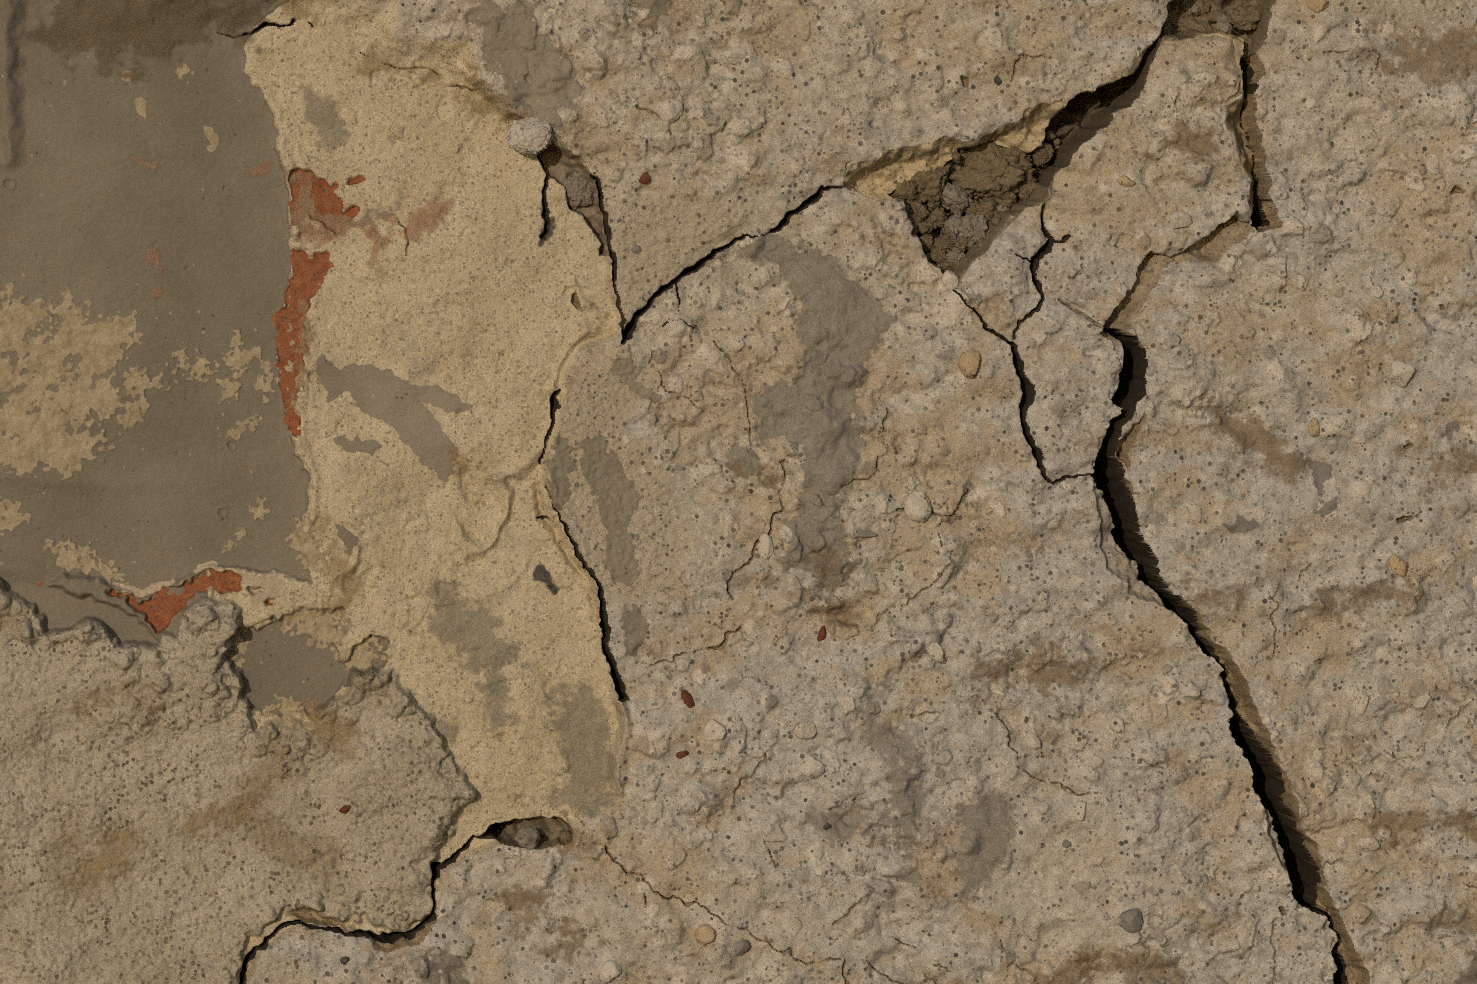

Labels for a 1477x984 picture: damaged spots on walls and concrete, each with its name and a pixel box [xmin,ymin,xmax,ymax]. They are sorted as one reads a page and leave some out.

peeling [203,125,220,152]
peeling [301,84,350,148]
crack [1325,48,1384,101]
flaking render [888,182,1049,282]
peeling [0,168,473,491]
peeling [0,495,32,537]
peeling [37,496,391,680]
peeling [251,689,318,732]
peeling [426,579,523,736]
peeling [475,683,616,850]
crack [533,37,1370,984]
crack [239,835,476,984]